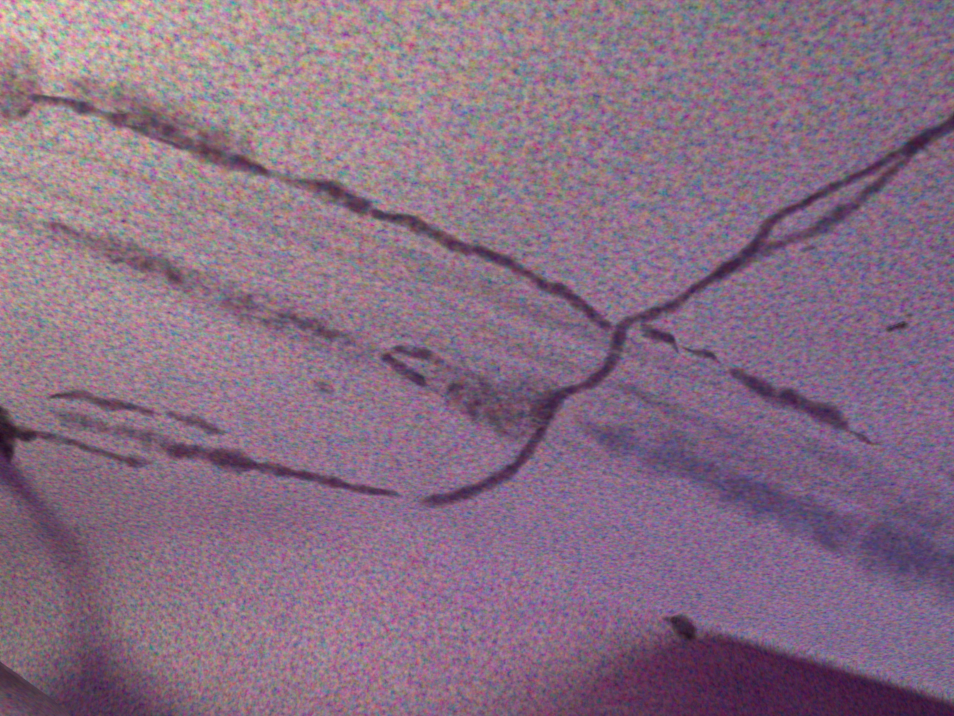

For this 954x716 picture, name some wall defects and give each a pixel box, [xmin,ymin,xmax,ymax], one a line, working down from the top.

crack [24,95,954,505]